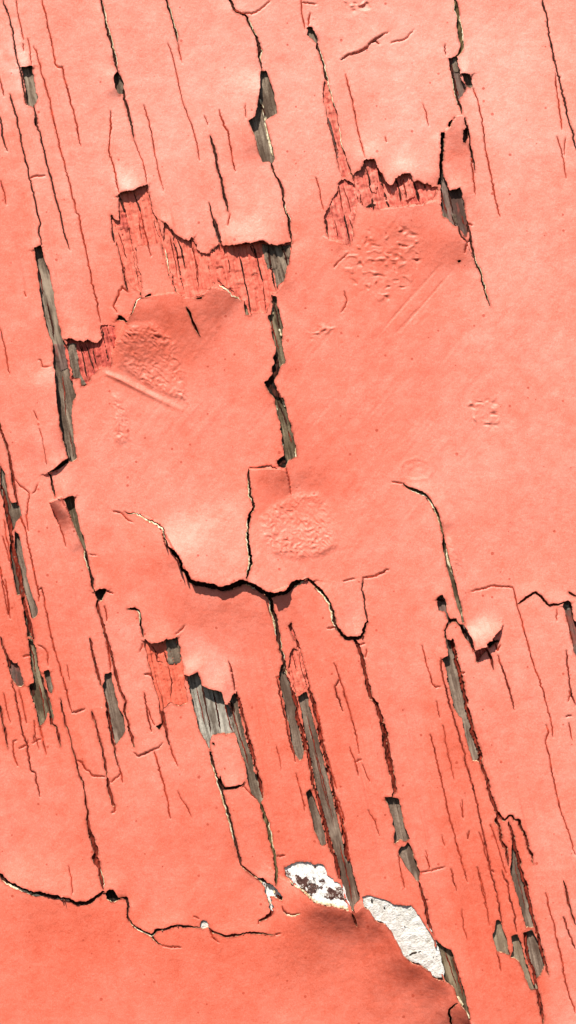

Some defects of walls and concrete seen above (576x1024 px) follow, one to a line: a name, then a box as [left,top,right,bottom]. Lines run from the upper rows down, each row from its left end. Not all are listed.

peeling [249,71,277,163]
peeling [323,80,473,246]
crack [0,330,10,373]
peeling [34,246,127,554]
peeling [111,165,296,468]
crack [393,482,444,537]
crack [0,412,397,948]
peeling [145,628,263,802]
peeling [437,538,501,761]
peeling [279,623,470,1020]
peeling [493,847,544,989]